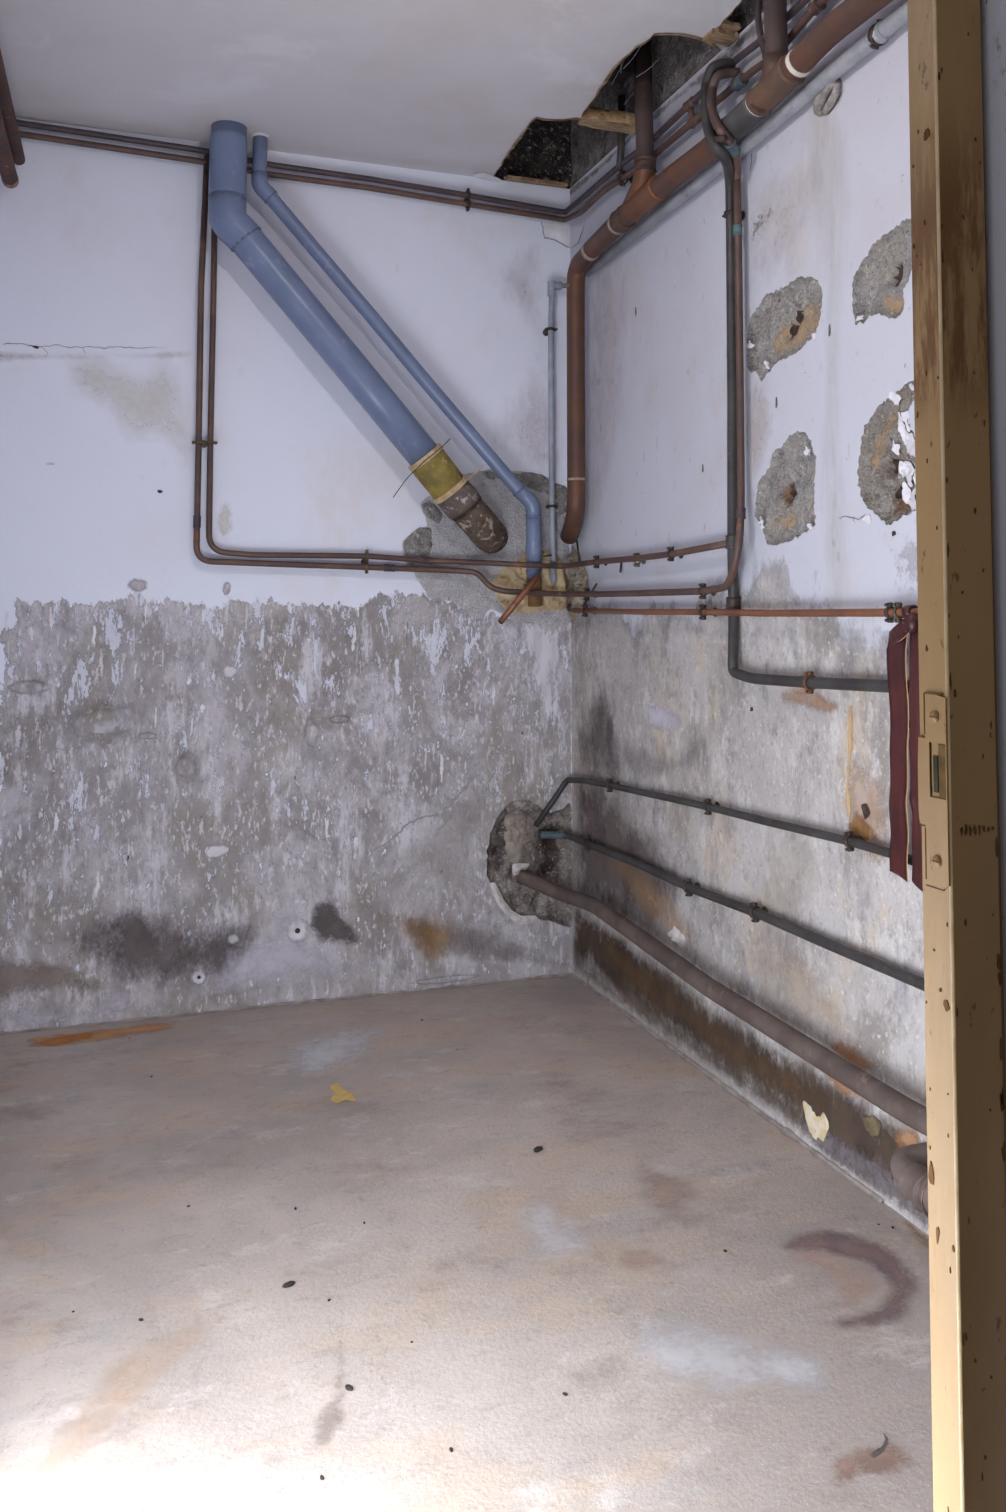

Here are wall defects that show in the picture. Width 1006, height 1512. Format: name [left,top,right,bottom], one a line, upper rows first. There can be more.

spalling [472,0,743,182]
crack [5,343,152,356]
flaking render [746,276,823,382]
flaking render [852,218,943,325]
flaking render [754,431,817,546]
flaking render [857,363,939,525]
damp [81,903,357,981]
peeling [0,565,958,1273]
damp [581,791,679,930]
damp [574,912,929,1226]